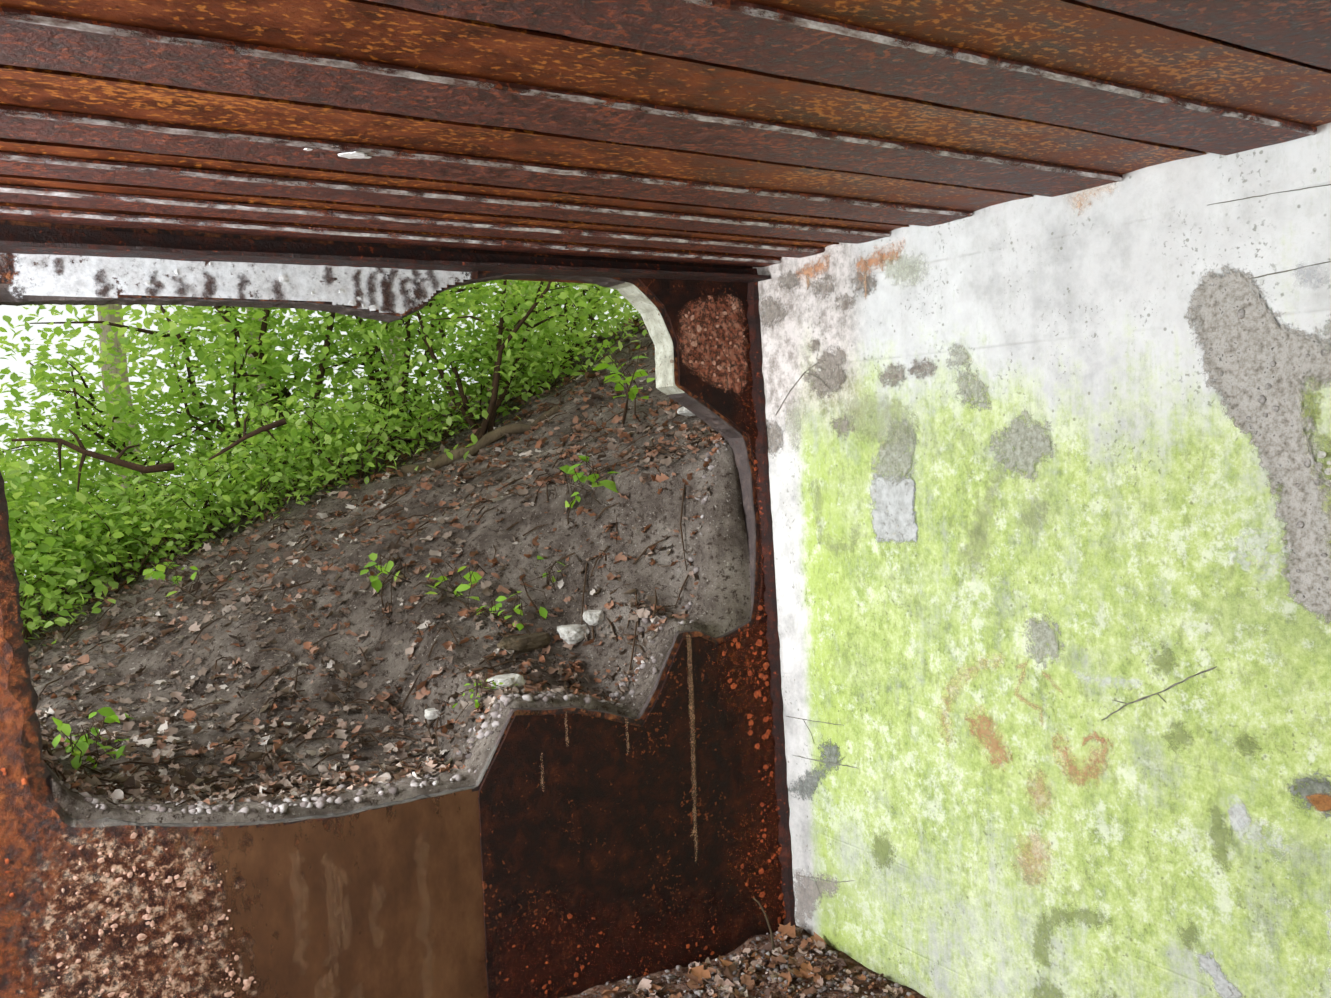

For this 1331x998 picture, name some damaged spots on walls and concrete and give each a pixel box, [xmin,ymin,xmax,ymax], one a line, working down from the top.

spalling [1187,266,1331,624]
corrosion [716,268,796,931]
damp [1153,646,1178,674]
damp [1165,722,1193,750]
damp [1235,735,1261,756]
damp [1228,803,1263,839]
corrosion [170,711,739,998]
damp [872,836,896,869]
damp [793,872,839,927]
damp [1033,909,1108,966]
damp [1197,952,1242,998]